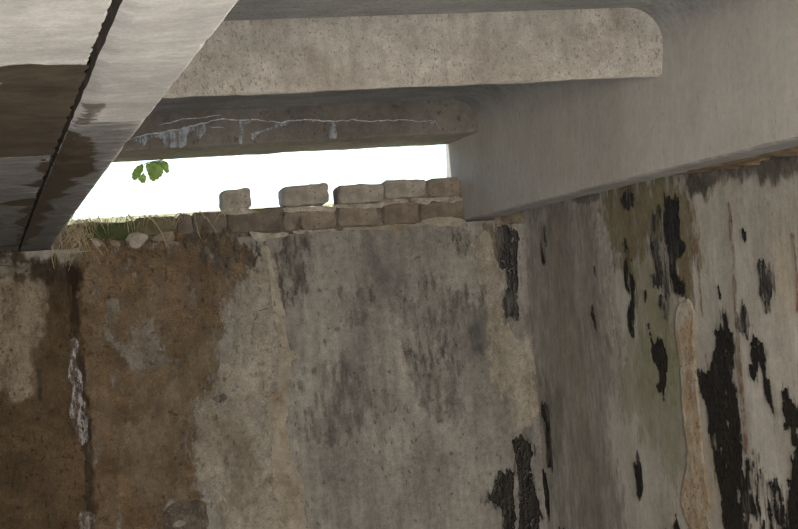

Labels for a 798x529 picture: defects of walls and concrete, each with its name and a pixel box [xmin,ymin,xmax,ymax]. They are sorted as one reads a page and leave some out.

crack [75,356,95,529]
water stain [0,64,308,529]
peeling [495,225,520,321]
peeling [485,401,554,529]
peeling [620,187,634,212]
peeling [622,193,798,529]